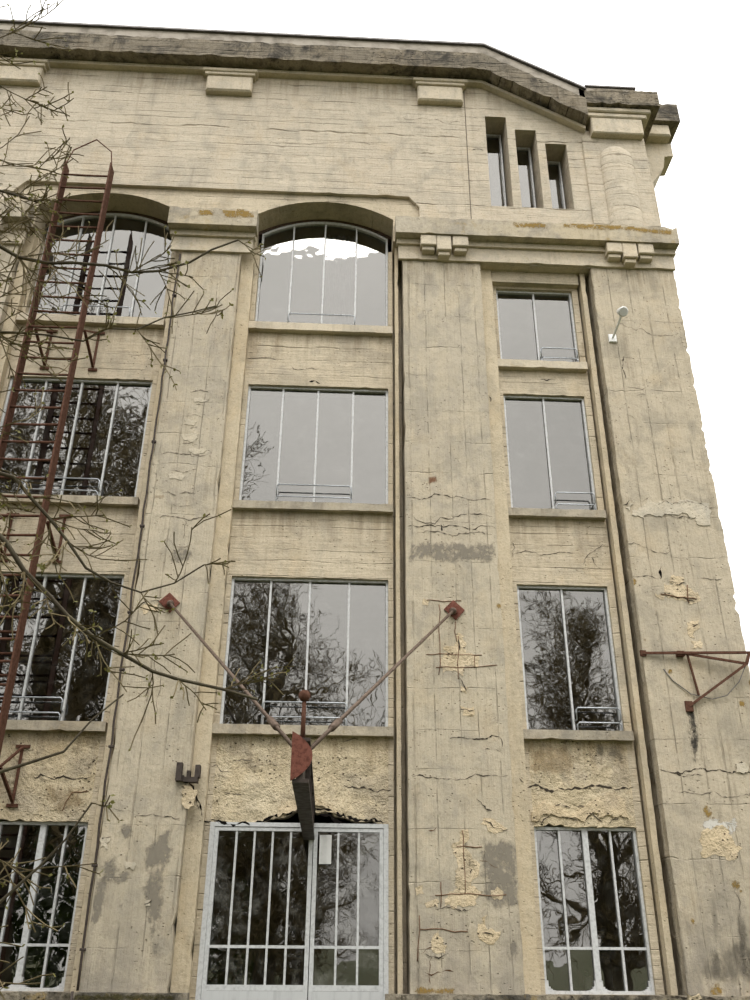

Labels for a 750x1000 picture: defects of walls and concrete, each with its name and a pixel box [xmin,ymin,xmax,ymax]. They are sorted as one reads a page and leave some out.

peeling [617,498,712,526]
crack [408,493,603,565]
damp [410,542,494,561]
spalling [655,575,701,605]
crack [656,768,750,798]
spalling [699,825,742,861]
spalling [415,799,518,961]